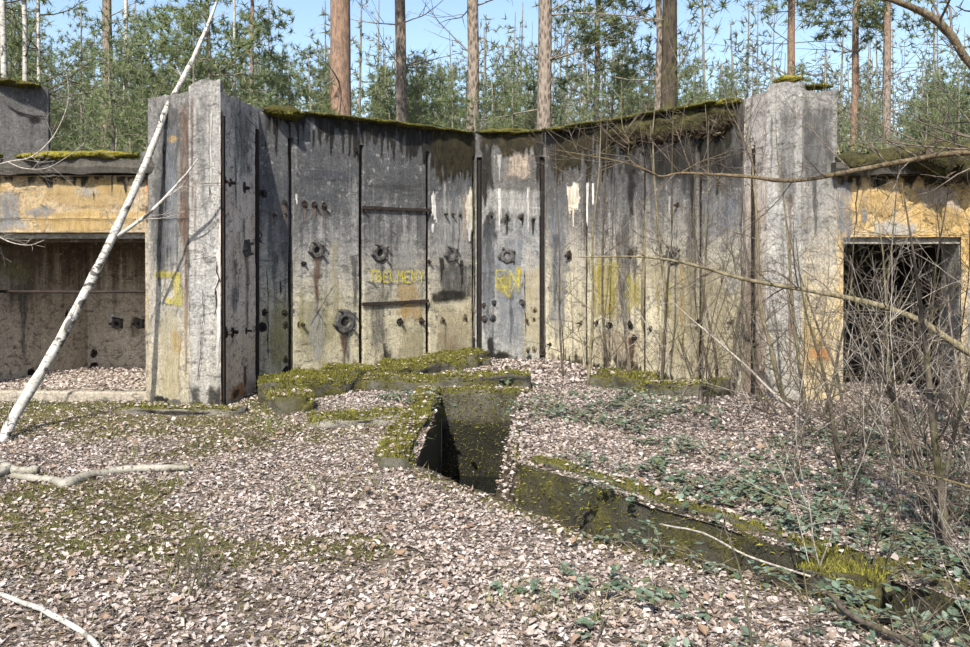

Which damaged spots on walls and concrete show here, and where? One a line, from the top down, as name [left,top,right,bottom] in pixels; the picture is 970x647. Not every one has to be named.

leakage [267,103,751,392]
peeling [861,186,964,236]